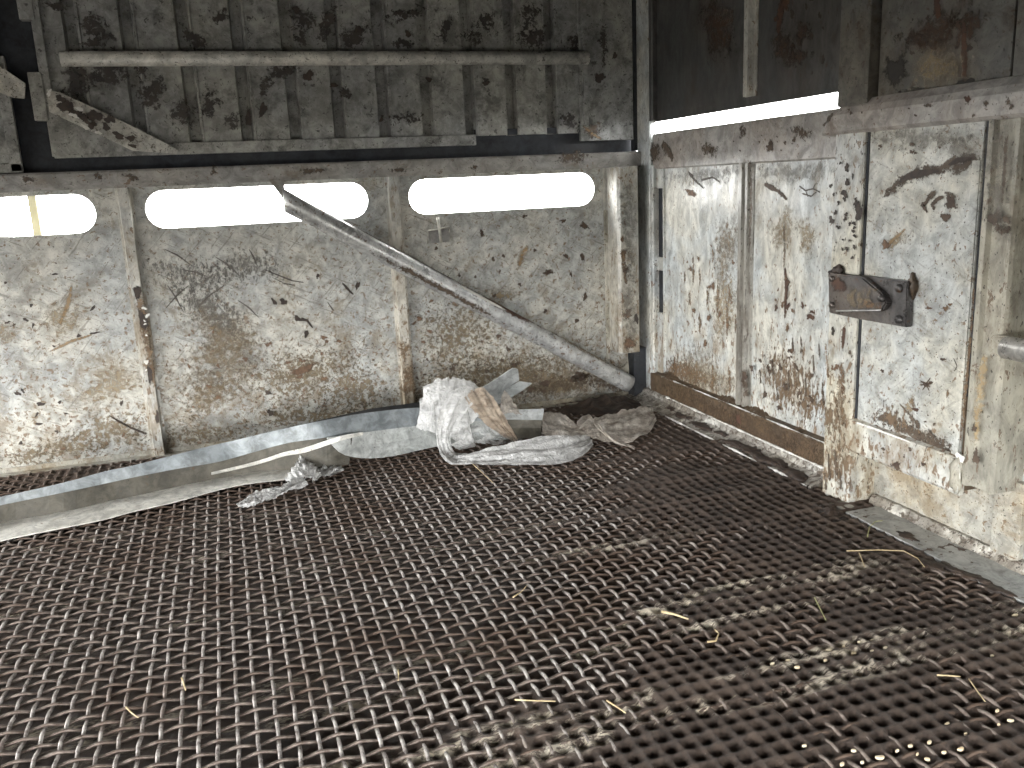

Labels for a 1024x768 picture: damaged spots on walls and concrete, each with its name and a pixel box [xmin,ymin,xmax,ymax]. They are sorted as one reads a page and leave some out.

rust [42,1,117,51]
rust [288,4,427,49]
rust [463,1,546,50]
rust [60,66,314,130]
rust [379,111,424,125]
rust [133,286,168,387]
rust [155,217,597,446]
rust [655,212,824,465]
rust [0,446,63,469]